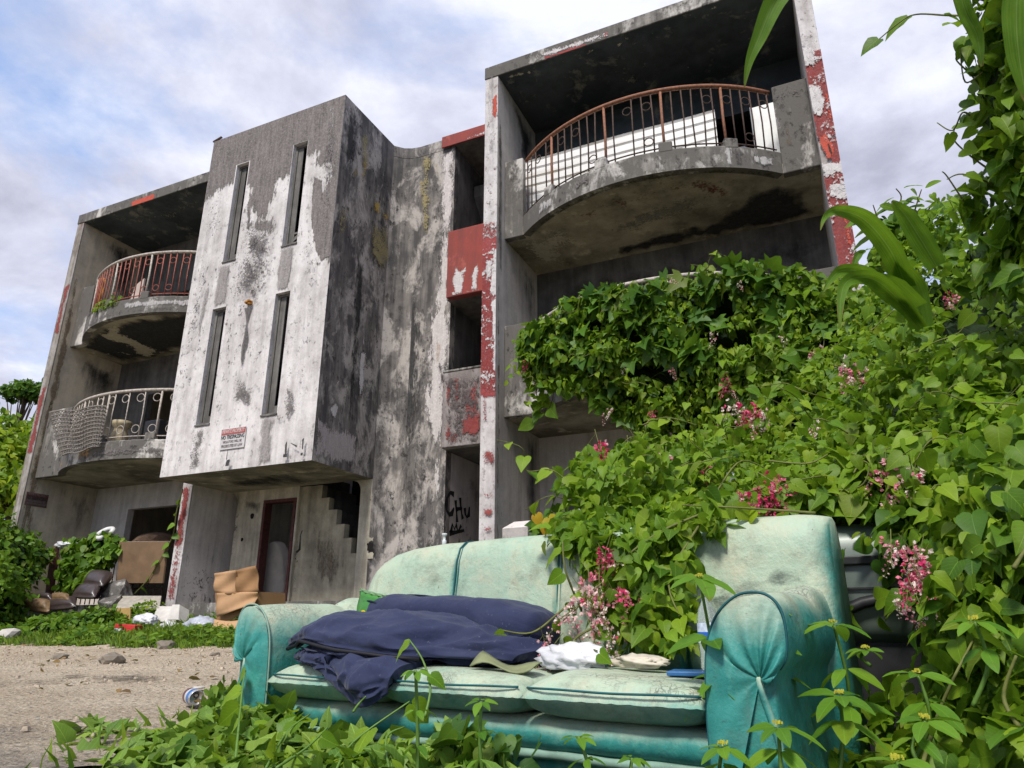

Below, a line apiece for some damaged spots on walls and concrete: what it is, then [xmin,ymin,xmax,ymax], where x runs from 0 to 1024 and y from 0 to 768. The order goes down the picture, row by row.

damp [322,117,356,234]
peeling [802,29,859,265]
damp [233,380,255,403]
damp [330,263,364,417]
damp [406,289,423,445]
peeling [444,221,497,444]
peeling [166,536,183,599]
damp [403,470,422,522]